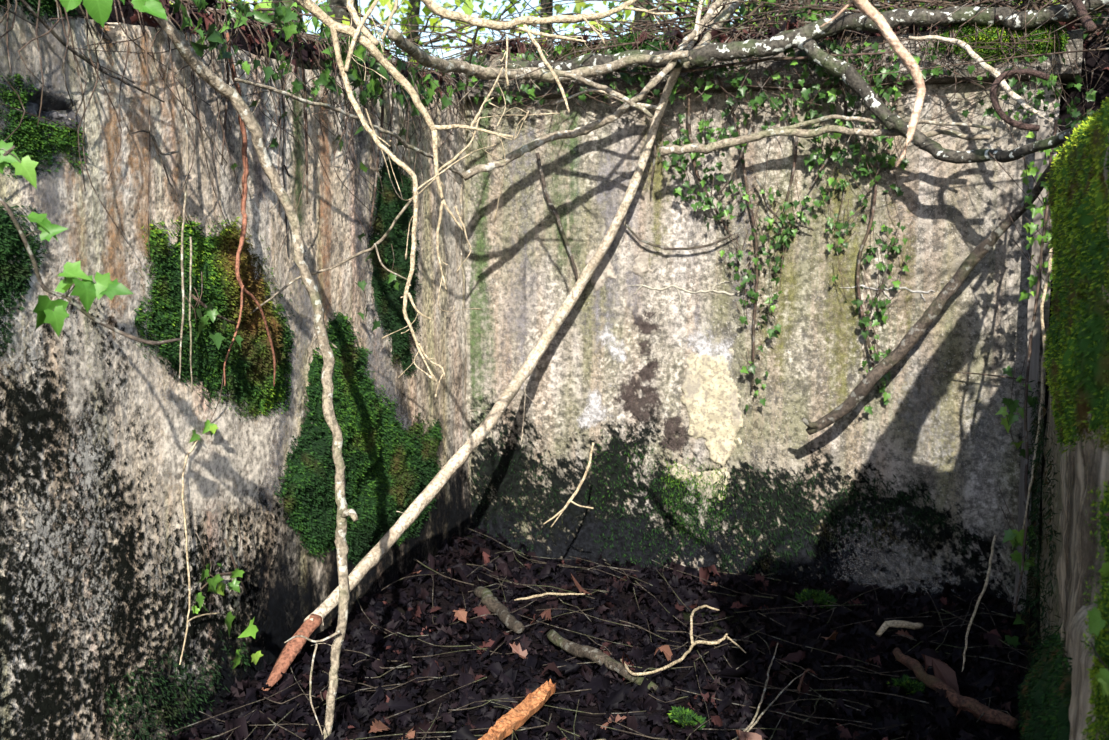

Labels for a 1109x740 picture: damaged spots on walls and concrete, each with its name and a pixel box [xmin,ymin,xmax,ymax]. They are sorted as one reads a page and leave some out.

water stain [223,96,269,268]
water stain [0,297,40,377]
water stain [9,338,113,653]
water stain [135,252,151,299]
water stain [381,358,419,437]
water stain [128,392,1034,740]
water stain [578,271,689,453]
flaking render [670,349,743,500]
water stain [688,333,731,361]